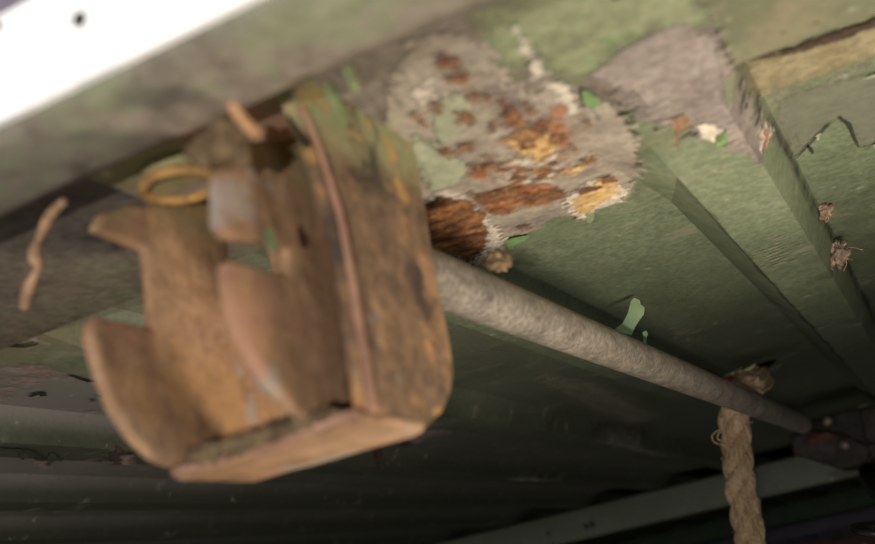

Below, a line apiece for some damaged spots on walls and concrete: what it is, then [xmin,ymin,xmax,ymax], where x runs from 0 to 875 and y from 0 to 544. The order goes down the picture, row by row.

corrosion [383,23,649,267]
peeling [471,0,773,167]